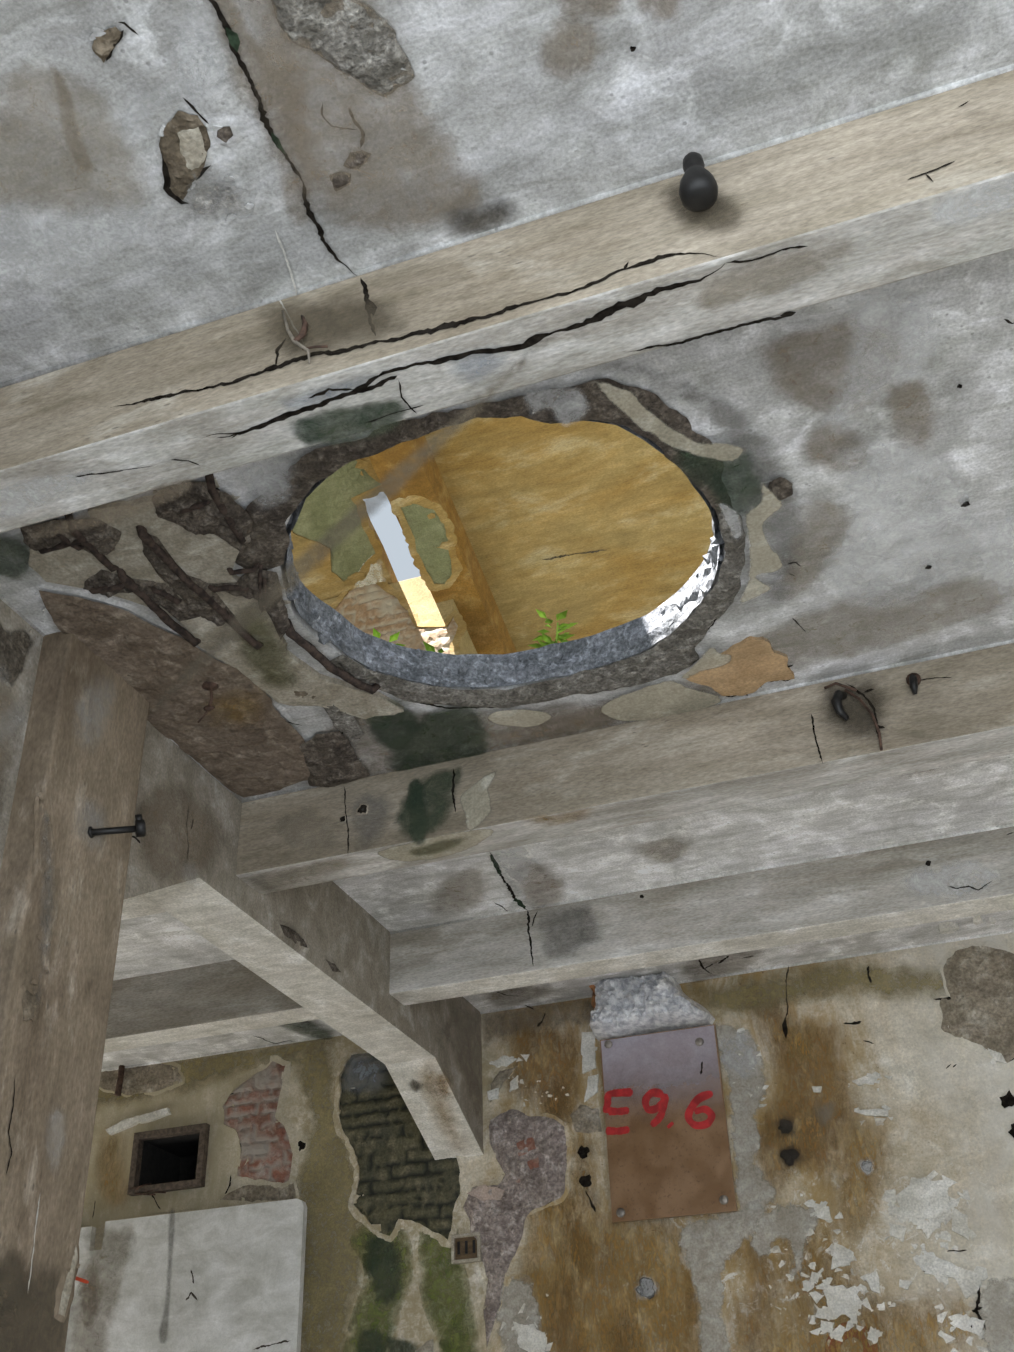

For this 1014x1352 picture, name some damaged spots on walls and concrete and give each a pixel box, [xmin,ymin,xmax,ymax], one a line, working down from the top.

flaking render [259,0,423,103]
spalling [149,98,244,205]
crack [76,0,807,477]
water stain [769,307,930,469]
water stain [159,360,524,704]
spalling [20,378,801,797]
crack [490,853,537,964]
flaking render [933,940,1014,1069]
flaking render [216,1055,307,1206]
flaking render [333,1031,606,1352]
rust [757,1002,883,1229]
peeling [767,1193,897,1345]